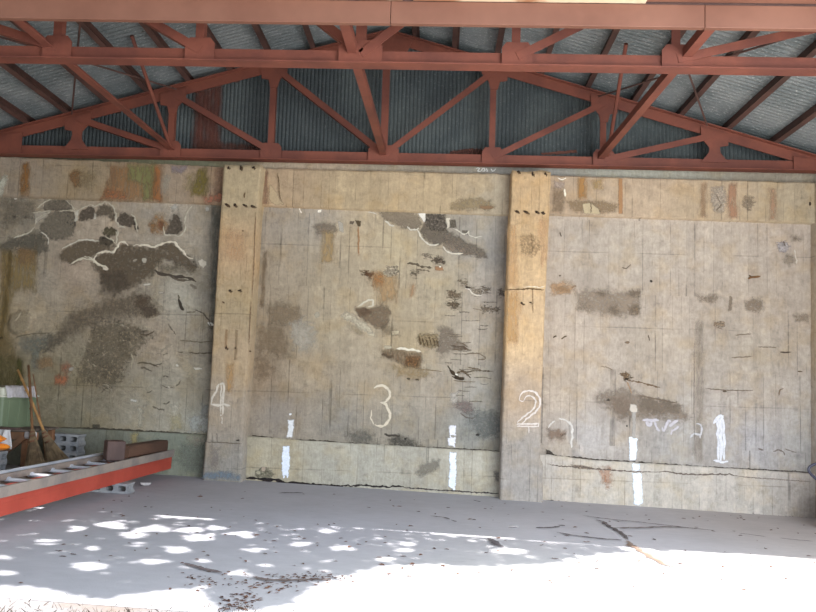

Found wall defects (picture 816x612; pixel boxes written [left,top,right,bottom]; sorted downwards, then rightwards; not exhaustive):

spalling [16,199,139,242]
spalling [163,206,192,237]
spalling [419,213,468,235]
damp [0,207,221,367]
damp [597,388,695,441]
crack [546,448,809,482]
crack [488,538,504,547]
crack [536,515,708,567]